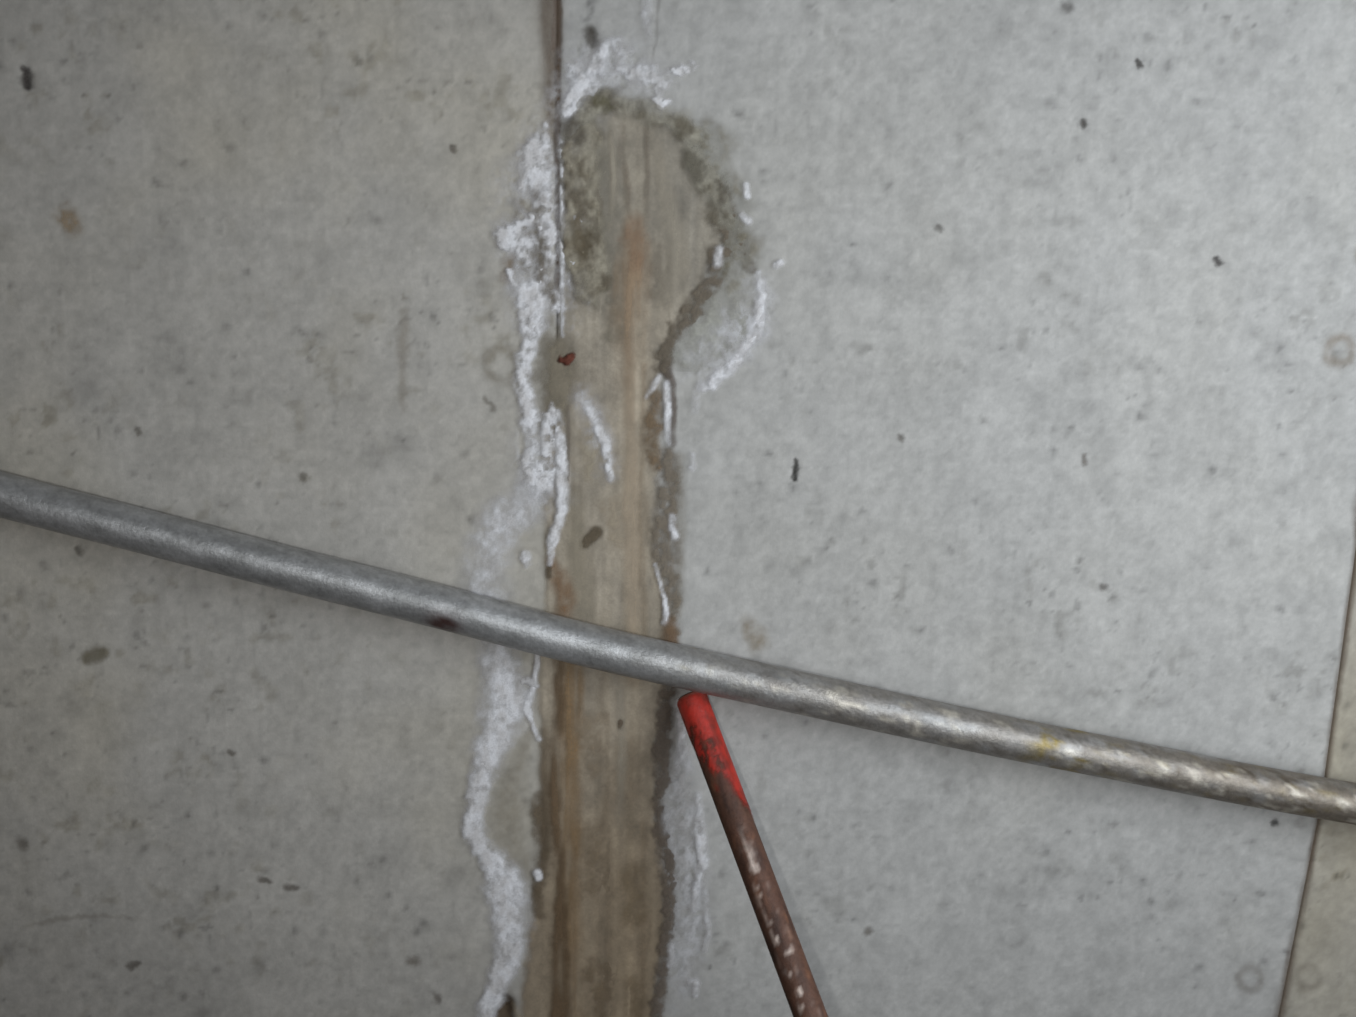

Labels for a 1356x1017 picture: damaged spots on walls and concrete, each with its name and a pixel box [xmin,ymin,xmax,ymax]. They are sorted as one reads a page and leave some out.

water stain [471,39,784,643]
water stain [463,641,710,1017]